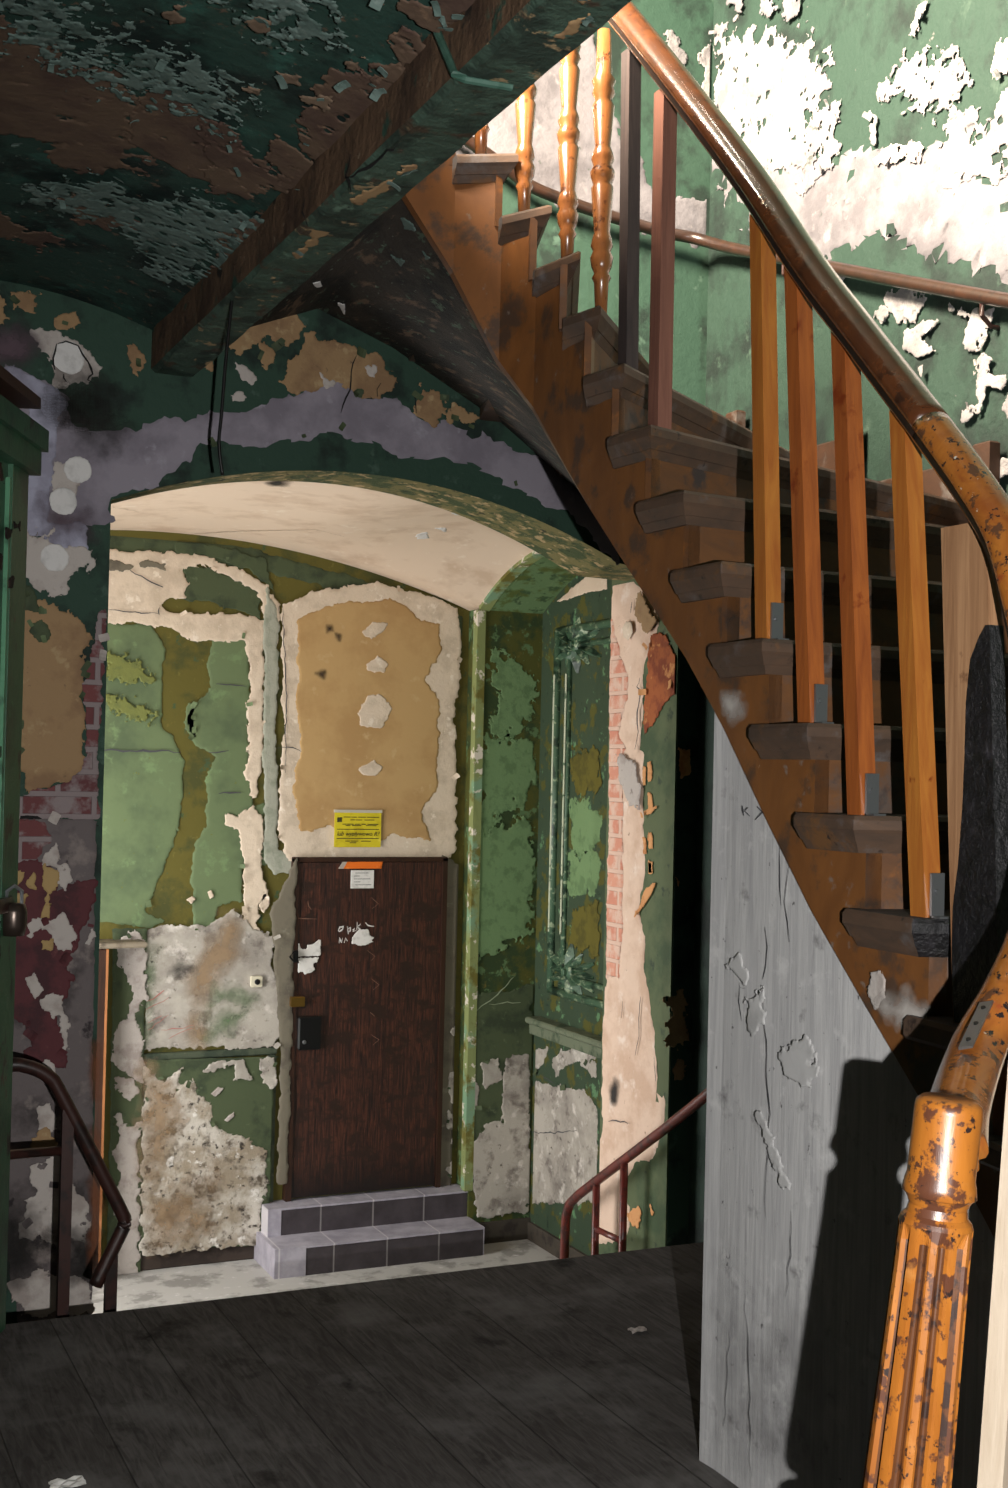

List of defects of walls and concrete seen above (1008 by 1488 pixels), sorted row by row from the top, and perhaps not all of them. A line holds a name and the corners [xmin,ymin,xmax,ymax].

peeling [0,0,476,294]
peeling [663,0,1008,285]
peeling [0,290,42,324]
peeling [54,312,81,330]
peeling [127,343,146,376]
peeling [204,314,480,429]
peeling [873,288,1008,423]
peeling [1000,457,1008,478]
peeling [0,521,298,1323]
spalling [473,582,689,1244]
spalling [440,855,459,1186]